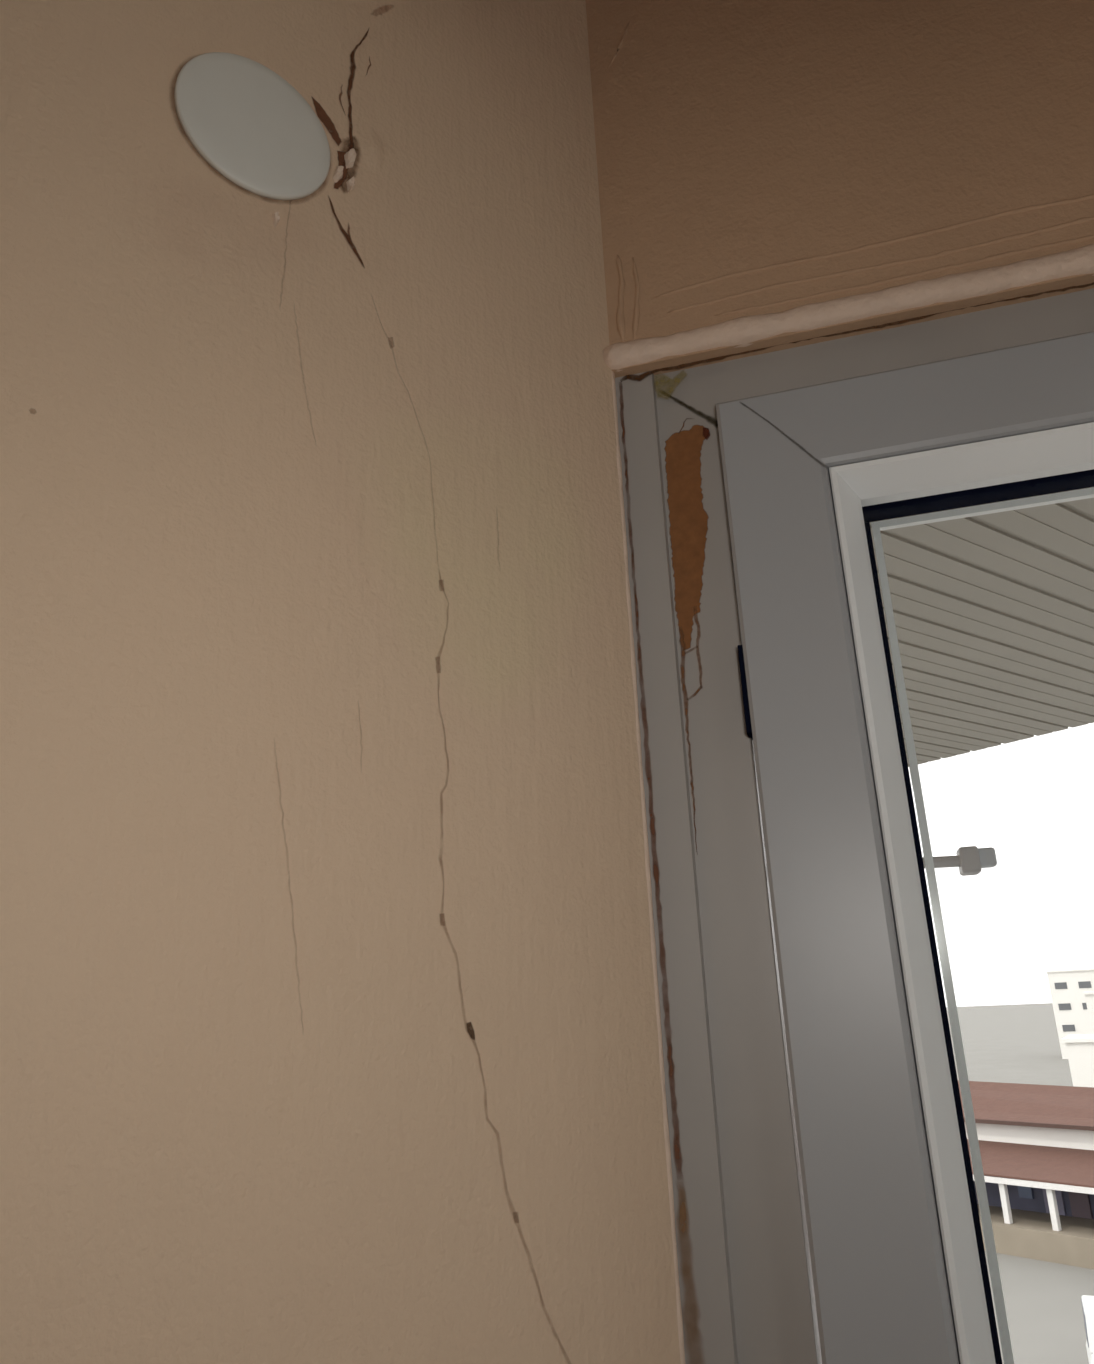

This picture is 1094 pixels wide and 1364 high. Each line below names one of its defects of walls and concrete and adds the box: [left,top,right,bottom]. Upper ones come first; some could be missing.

crack [339,29,371,166]
crack [329,198,364,266]
peeling [664,420,710,851]
crack [467,1022,475,1040]